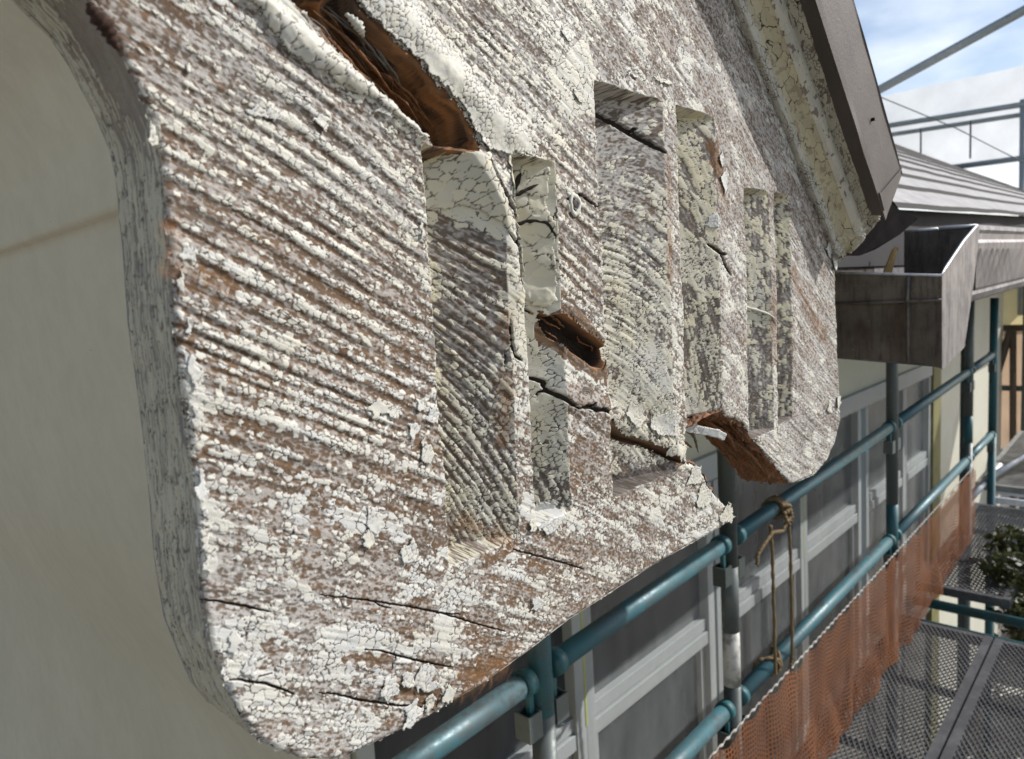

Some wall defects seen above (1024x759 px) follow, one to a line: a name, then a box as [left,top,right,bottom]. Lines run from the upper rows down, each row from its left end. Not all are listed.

spalling [252,0,559,308]
crack [595,113,666,154]
crack [504,309,609,413]
peeling [366,398,439,464]
spalling [609,396,788,525]
peeling [194,468,212,580]
peeling [529,501,565,535]
crack [513,549,582,569]
crack [199,599,271,612]
crack [223,673,442,711]
crack [364,649,451,670]
peeling [380,663,457,731]